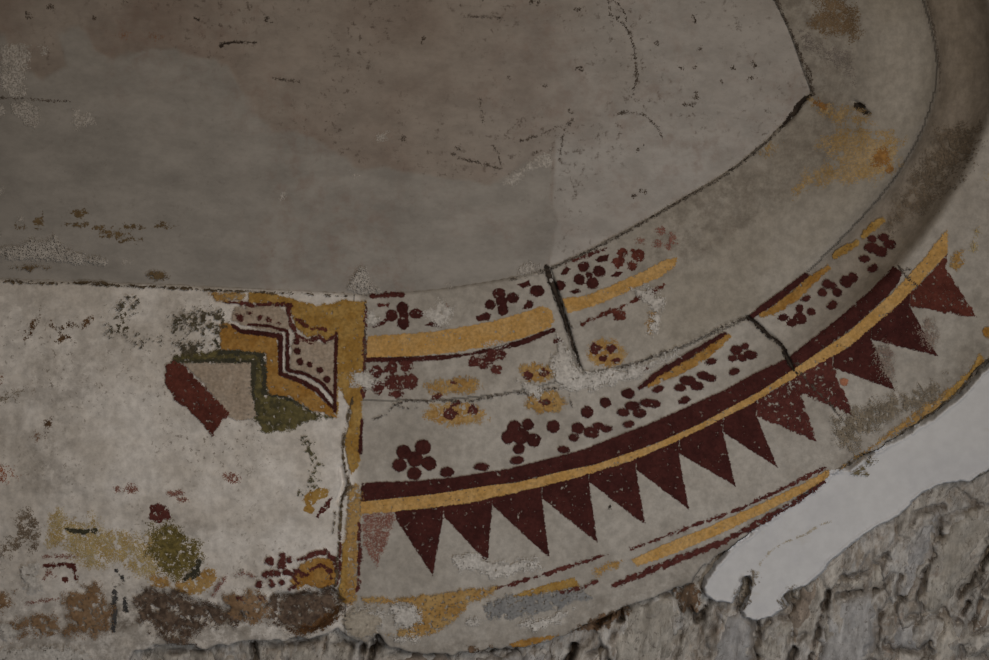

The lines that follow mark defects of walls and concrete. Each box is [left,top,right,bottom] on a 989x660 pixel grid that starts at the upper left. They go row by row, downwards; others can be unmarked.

crack [451,108,574,170]
crack [509,0,816,369]
crack [616,315,846,425]
flaking render [0,560,117,660]
flaking render [131,581,429,650]
flaking render [452,553,542,580]
flaking render [517,604,632,634]
flaking render [673,582,703,613]
flaking render [734,569,762,610]
flaking render [777,585,804,610]